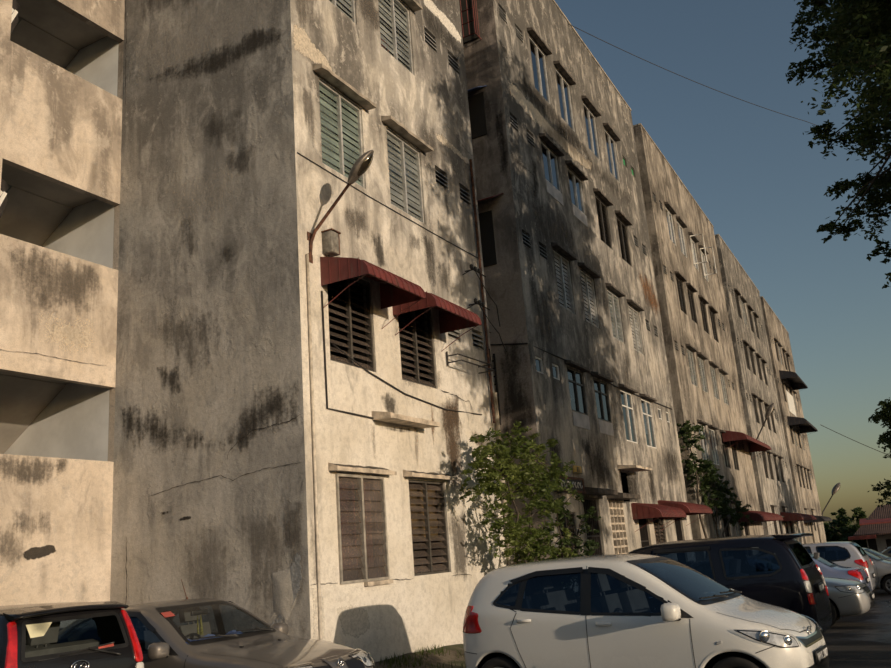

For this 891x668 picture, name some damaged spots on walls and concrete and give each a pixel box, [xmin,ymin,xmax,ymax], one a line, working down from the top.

spalling [424,0,461,43]
leakage [165,29,280,78]
peeling [293,25,332,71]
leakage [13,252,93,305]
leakage [161,369,180,392]
leakage [123,407,203,448]
leakage [229,389,296,448]
leakage [3,459,45,482]
crack [150,414,301,496]
leakage [449,517,466,576]